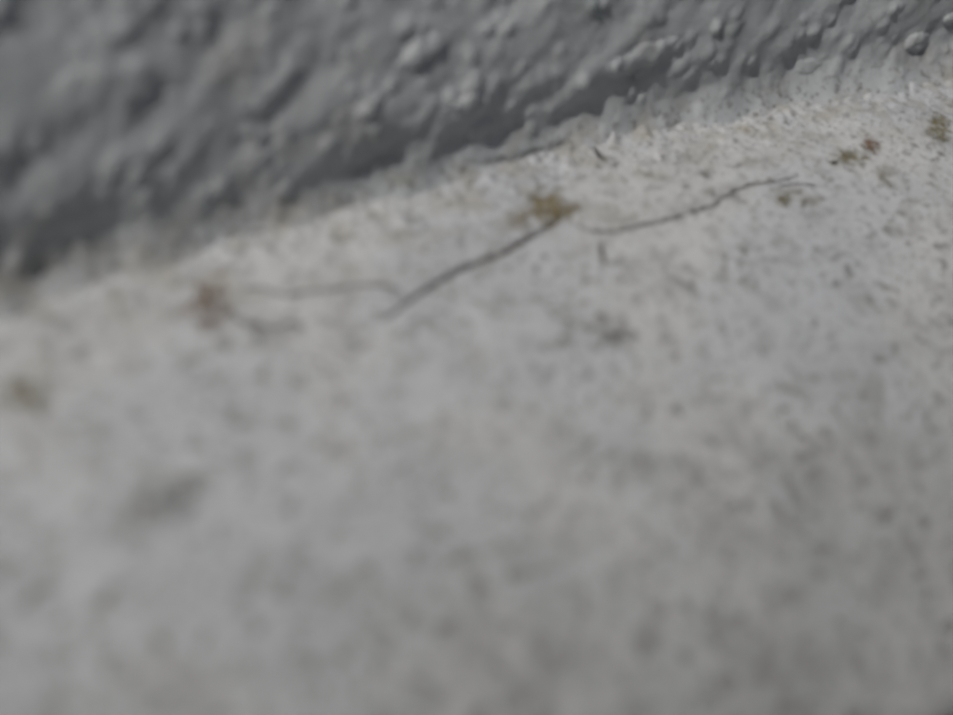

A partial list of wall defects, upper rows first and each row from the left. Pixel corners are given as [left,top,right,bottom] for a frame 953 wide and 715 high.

crack [247,177,817,321]